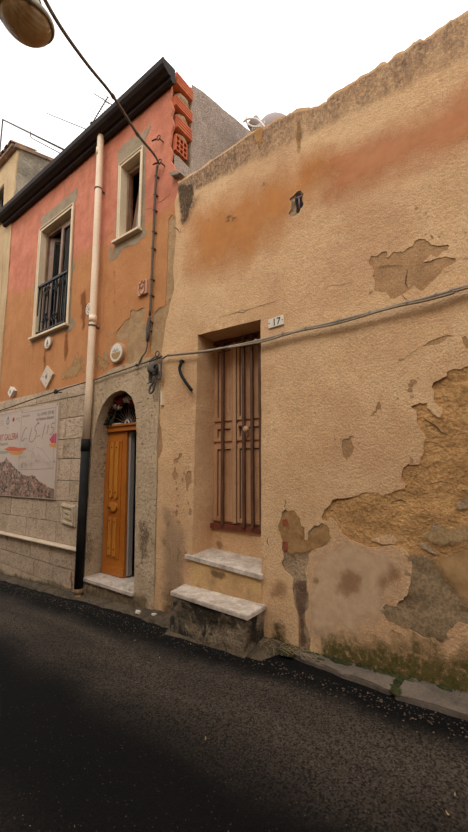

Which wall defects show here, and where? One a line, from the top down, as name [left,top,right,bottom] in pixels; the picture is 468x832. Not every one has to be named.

leakage [178,16,463,224]
peeling [96,215,176,371]
peeling [369,234,456,299]
peeling [278,367,468,648]